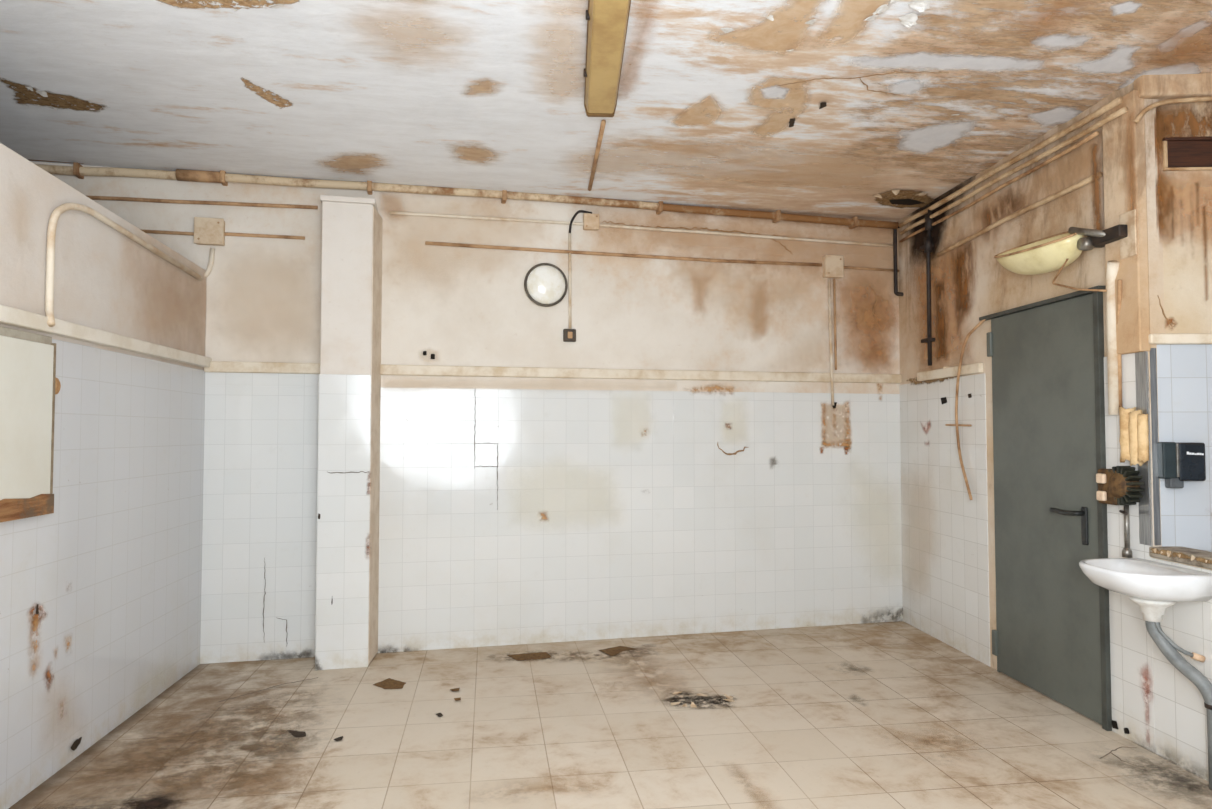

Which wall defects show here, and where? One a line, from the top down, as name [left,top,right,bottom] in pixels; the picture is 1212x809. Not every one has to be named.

peeling [158,0,299,11]
peeling [1,79,105,112]
peeling [673,96,721,126]
peeling [713,0,1212,183]
leakage [1154,101,1212,257]
leakage [848,285,890,357]
leakage [918,246,971,361]
corrosion [30,604,52,689]